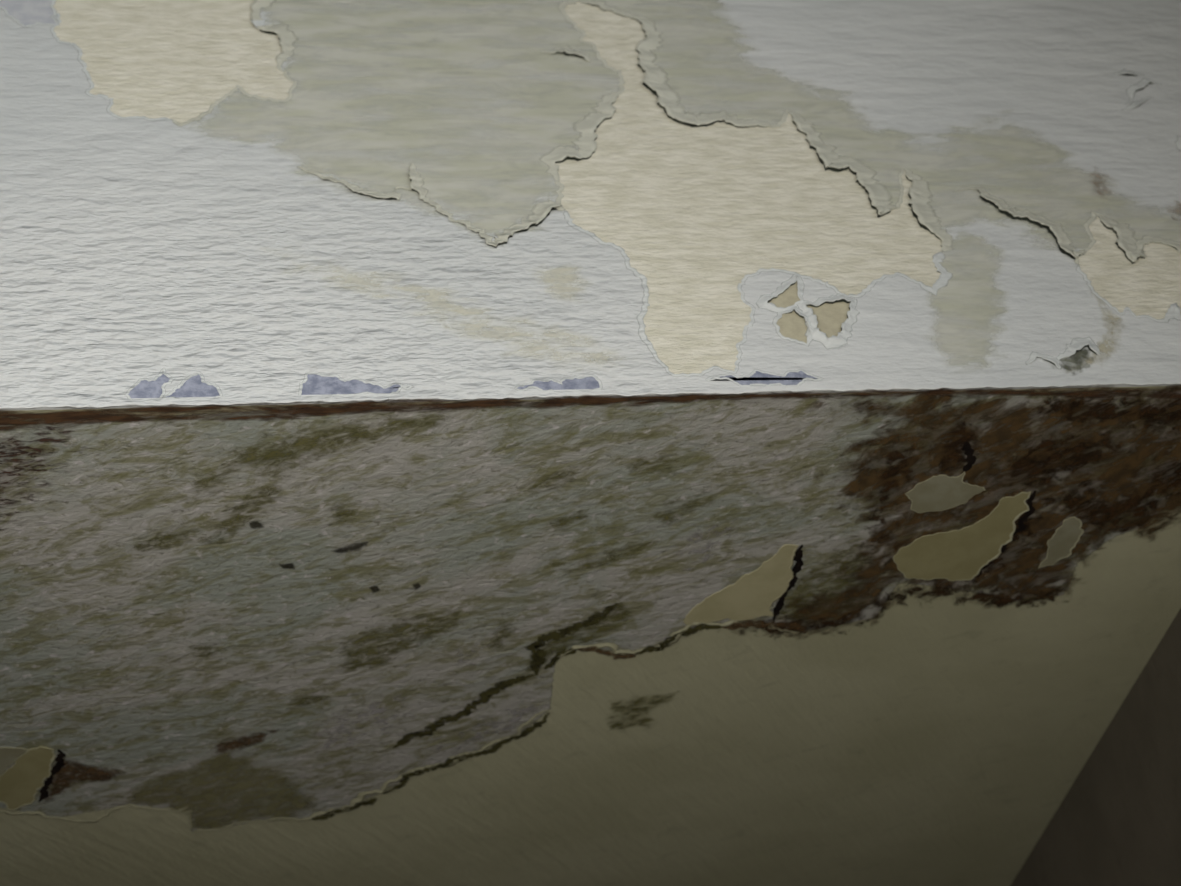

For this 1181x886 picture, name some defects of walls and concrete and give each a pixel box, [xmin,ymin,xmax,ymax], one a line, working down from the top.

peeling [44,0,297,126]
peeling [298,0,953,388]
peeling [954,186,1181,323]
spalling [125,368,223,402]
spalling [298,372,415,399]
damp [197,417,435,487]
damp [220,487,280,540]
damp [335,542,367,553]
damp [740,385,1181,637]
damp [343,613,458,669]
peeling [0,390,1181,832]
damp [130,753,309,828]